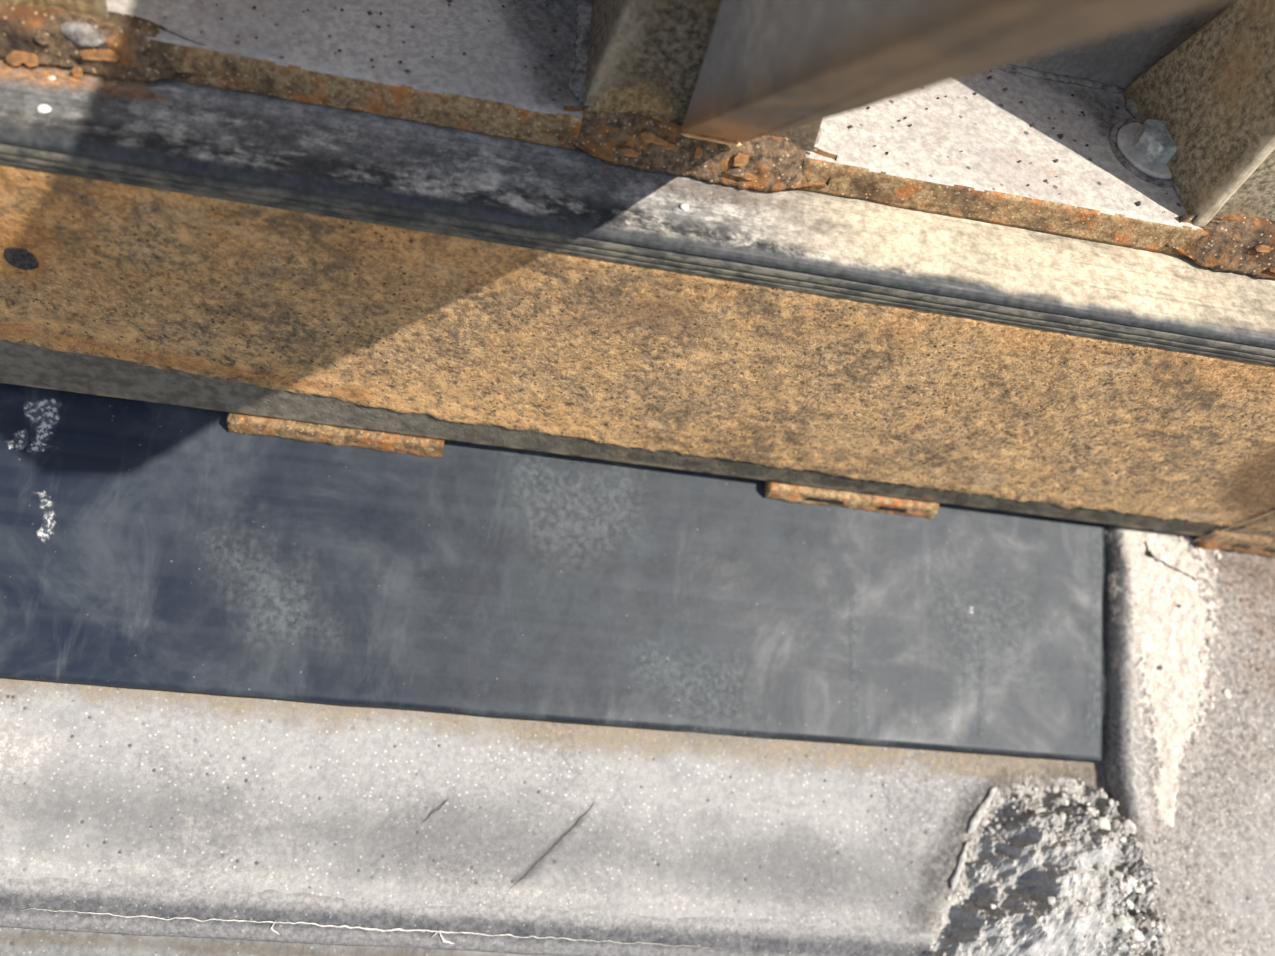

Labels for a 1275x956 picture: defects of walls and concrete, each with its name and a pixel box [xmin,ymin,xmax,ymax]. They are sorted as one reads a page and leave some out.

rust [0,0,207,83]
rust [558,93,838,192]
rust [1166,212,1275,279]
spalling [922,774,1171,956]